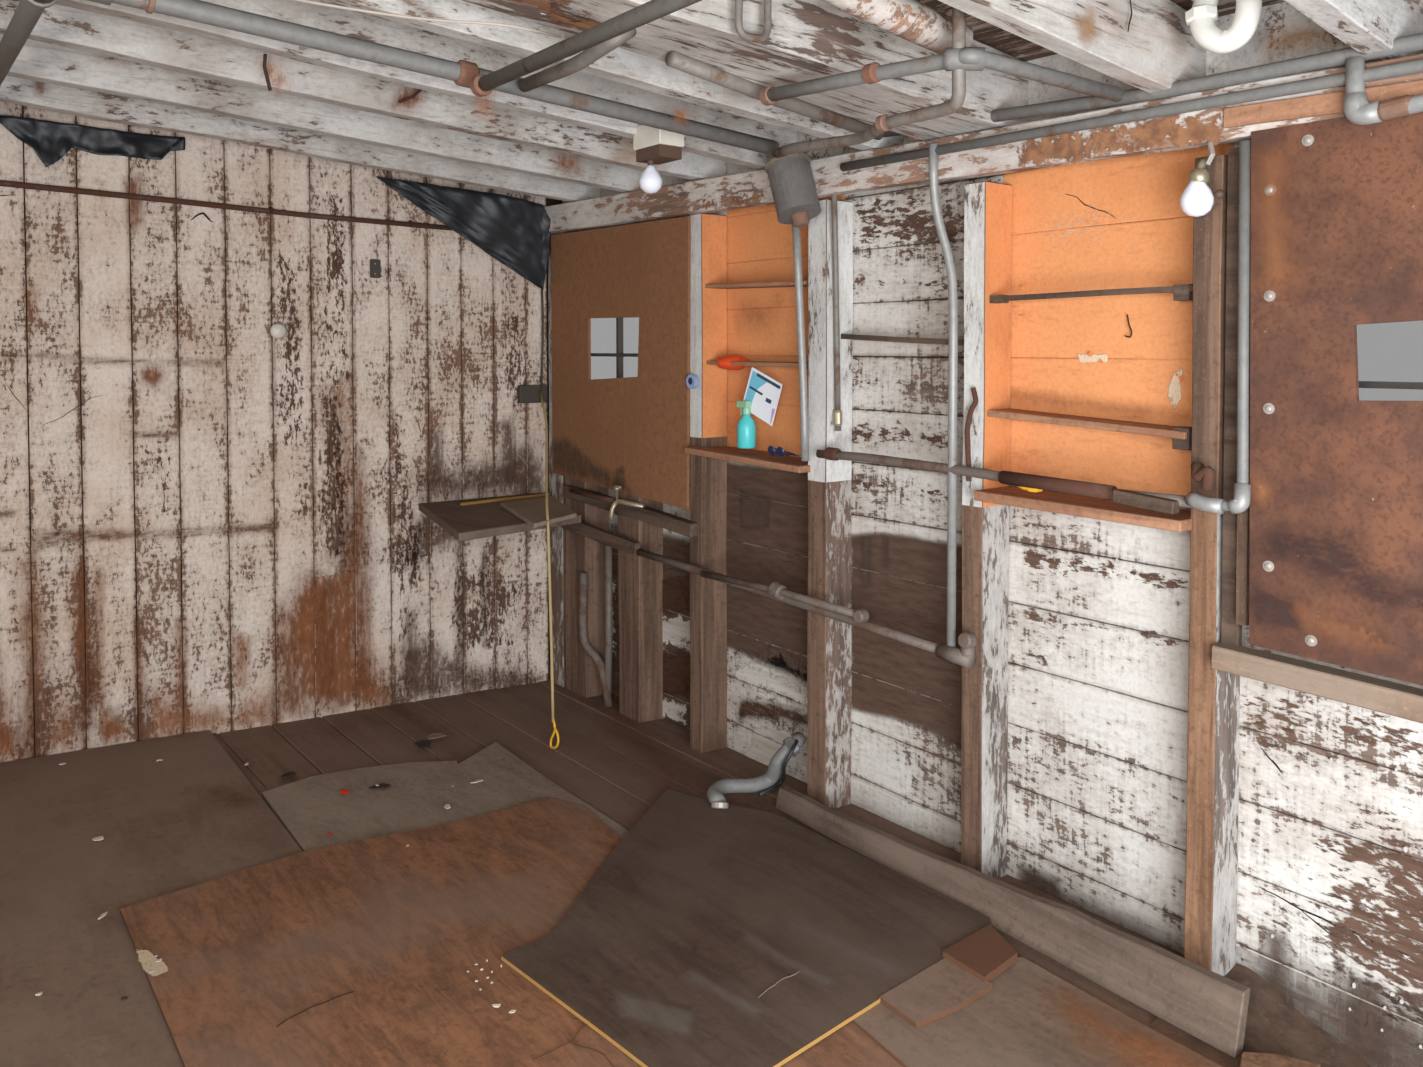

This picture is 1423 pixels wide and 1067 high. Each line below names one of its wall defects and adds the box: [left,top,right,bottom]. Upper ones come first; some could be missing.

peeling [852,189,964,292]
peeling [269,192,354,559]
water stain [421,421,624,496]
peeling [852,422,948,449]
corrosion [0,436,392,763]
water stain [407,520,461,567]
peeling [381,408,527,671]
water stain [400,583,532,701]
peeling [1024,607,1108,666]
peeling [1023,515,1188,596]
peeling [1239,695,1423,772]
peeling [1265,807,1423,1032]